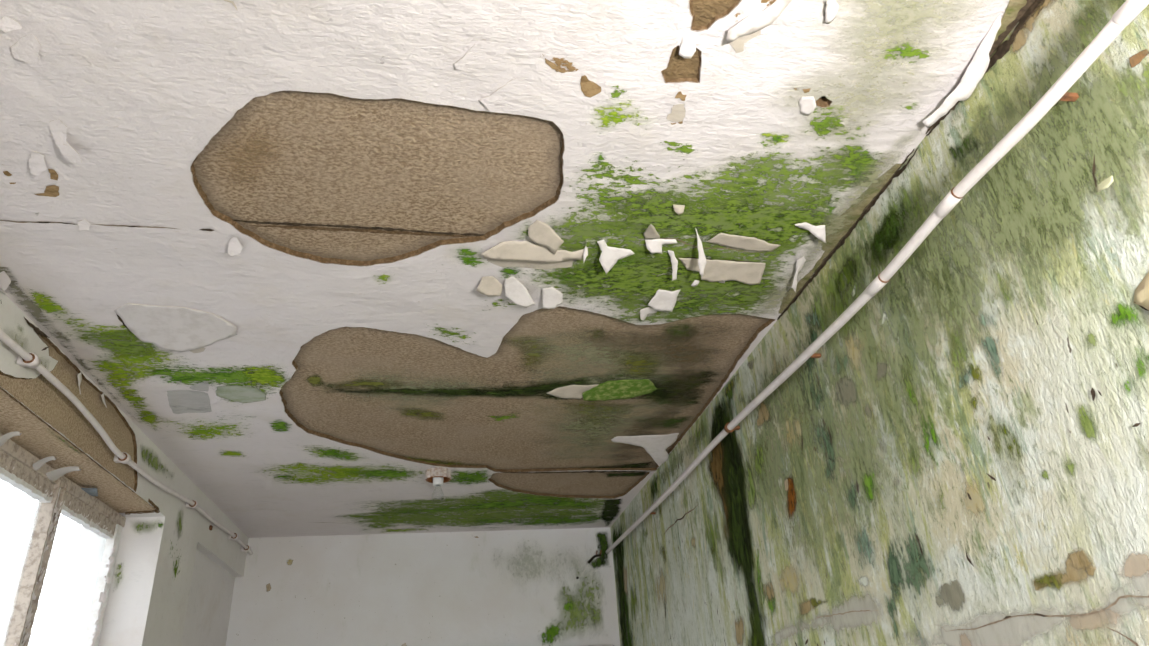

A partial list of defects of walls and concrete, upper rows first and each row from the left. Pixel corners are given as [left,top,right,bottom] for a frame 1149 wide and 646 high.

peeling [661,0,792,125]
crack [0,220,214,231]
flaking render [167,91,781,499]
peeling [791,256,806,292]
peeling [1133,272,1149,311]
crack [795,610,878,646]
crack [941,595,1149,646]